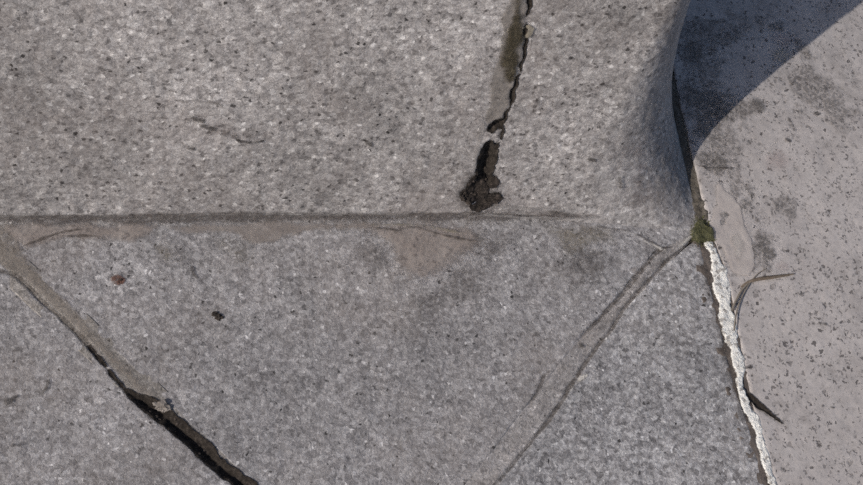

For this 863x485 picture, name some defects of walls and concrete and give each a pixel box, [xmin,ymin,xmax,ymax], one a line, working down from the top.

crack [460,0,533,213]
crack [0,270,258,485]
crack [747,393,783,424]